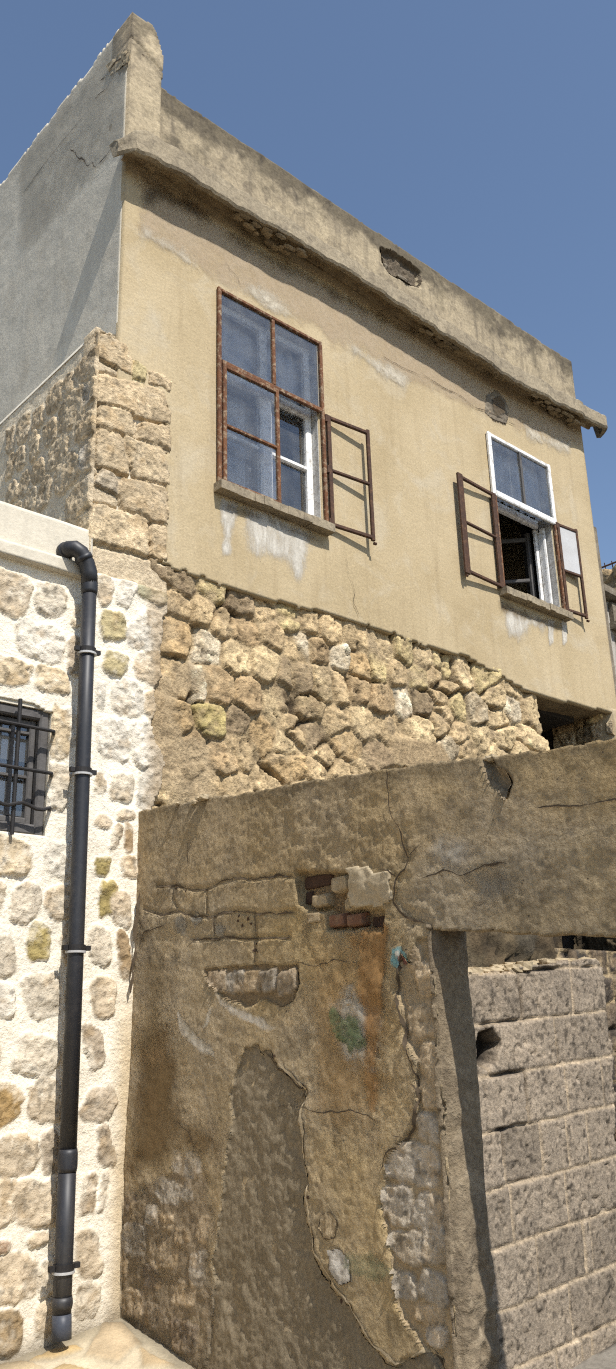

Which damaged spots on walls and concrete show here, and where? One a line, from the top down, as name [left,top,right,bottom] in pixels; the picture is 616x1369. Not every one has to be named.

crack [23,52,160,193]
peeling [142,185,580,452]
water stain [221,499,307,578]
crack [382,770,504,923]
water stain [129,1026,211,1168]
spalling [121,936,455,1369]
crack [264,952,420,1173]